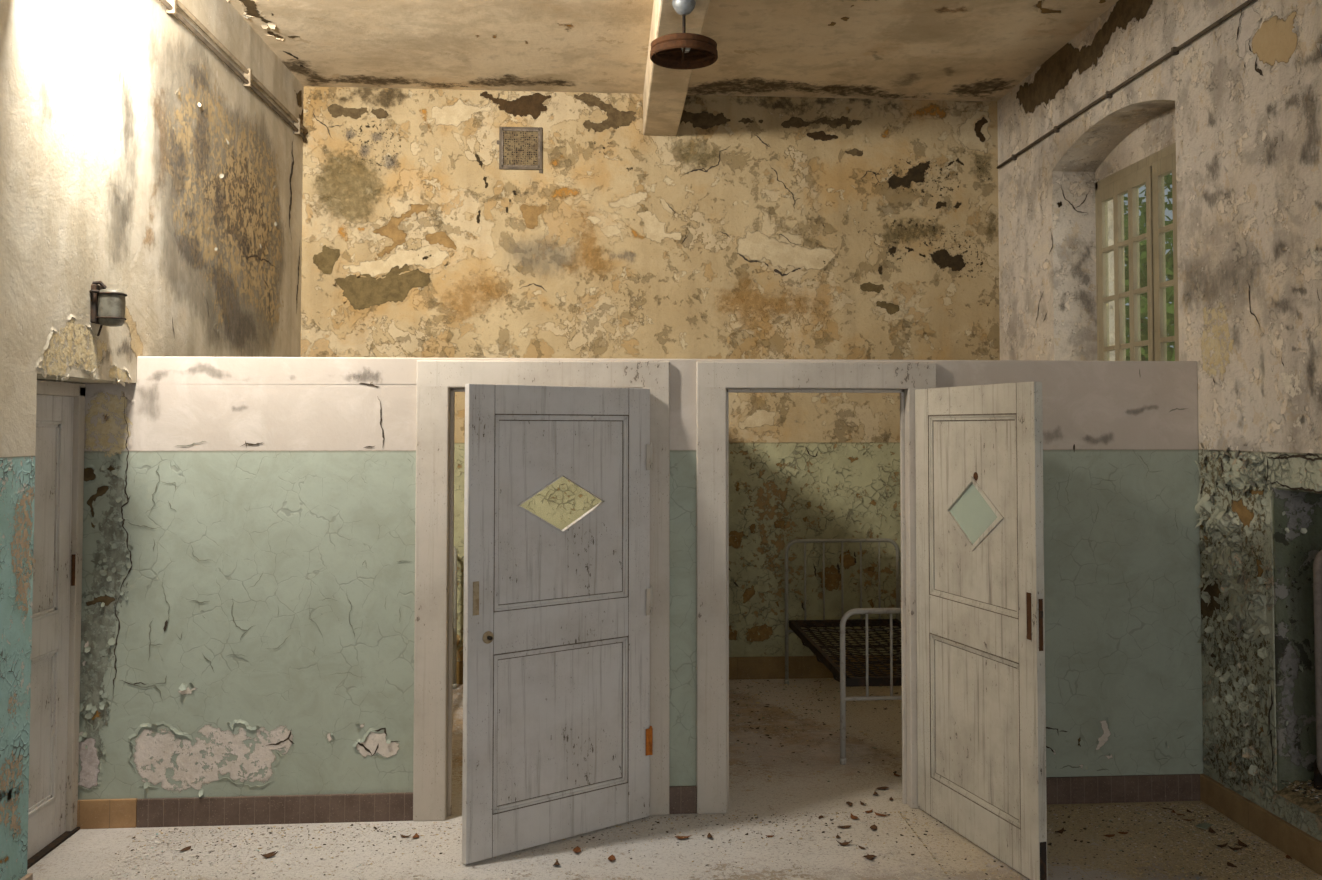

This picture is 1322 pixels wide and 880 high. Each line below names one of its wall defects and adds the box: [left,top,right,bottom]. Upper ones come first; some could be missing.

spalling [227,0,299,41]
spalling [1016,0,1156,120]
spalling [326,103,389,119]
spalling [432,91,555,131]
spalling [574,92,636,137]
spalling [781,116,863,156]
water stain [155,101,269,259]
spalling [313,201,459,314]
peeling [733,227,840,272]
peeling [35,307,143,793]
peeling [1194,442,1315,788]
peeling [127,719,293,797]